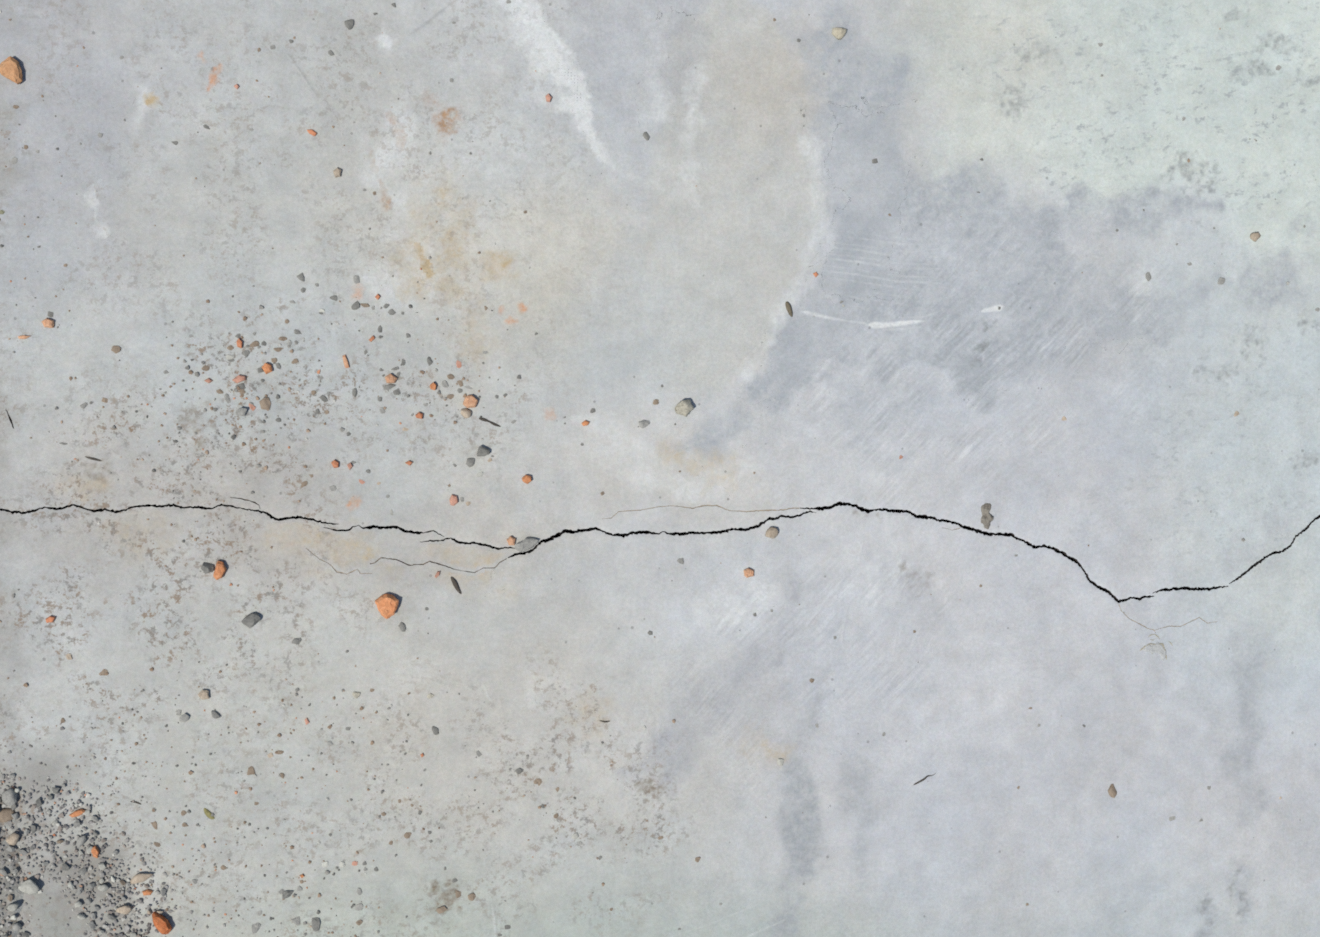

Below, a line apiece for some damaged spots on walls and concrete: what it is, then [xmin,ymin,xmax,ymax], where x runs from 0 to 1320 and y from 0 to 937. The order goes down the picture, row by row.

crack [0,497,1320,633]